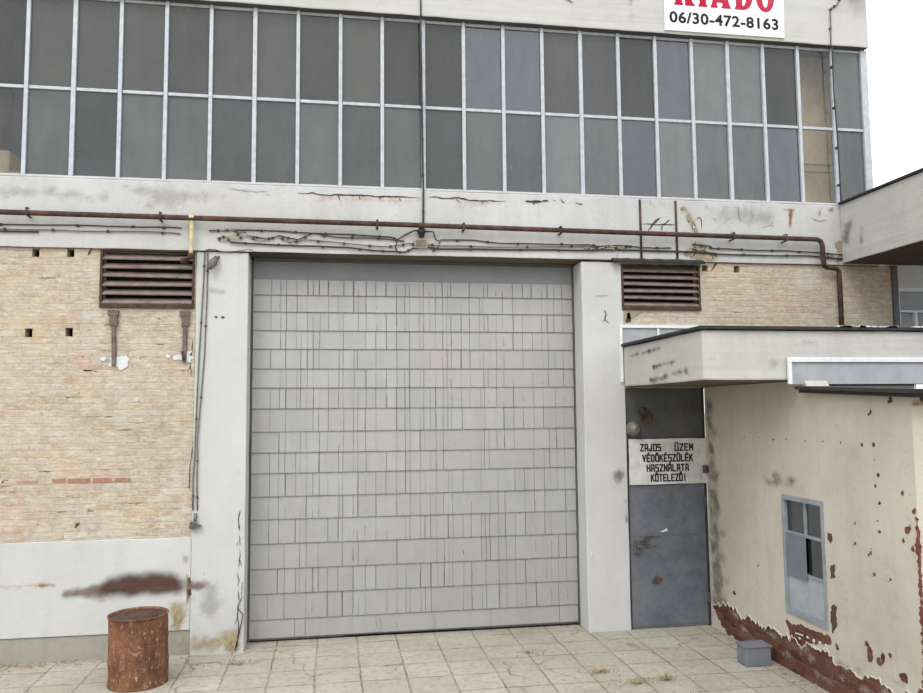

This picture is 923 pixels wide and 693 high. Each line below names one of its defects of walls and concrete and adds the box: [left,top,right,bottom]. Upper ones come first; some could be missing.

spalling [684,246,718,262]
corrosion [64,574,204,597]
crack [234,512,242,638]
spalling [902,508,923,654]
leakage [171,604,185,630]
leakage [193,630,238,650]
flaking render [712,591,923,693]